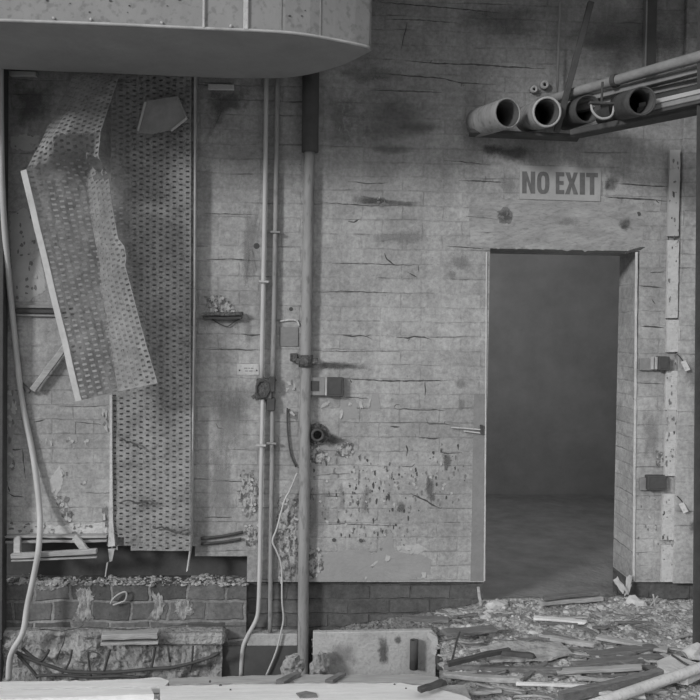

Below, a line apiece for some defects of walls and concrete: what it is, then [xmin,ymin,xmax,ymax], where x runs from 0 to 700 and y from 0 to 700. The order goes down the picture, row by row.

crack [377,2,543,93]
crack [332,253,419,277]
flaking render [655,449,674,468]
peeling [7,467,108,534]
flaking render [237,470,258,547]
flaking render [276,494,299,584]
flaking render [309,547,324,579]
peeling [310,442,467,567]